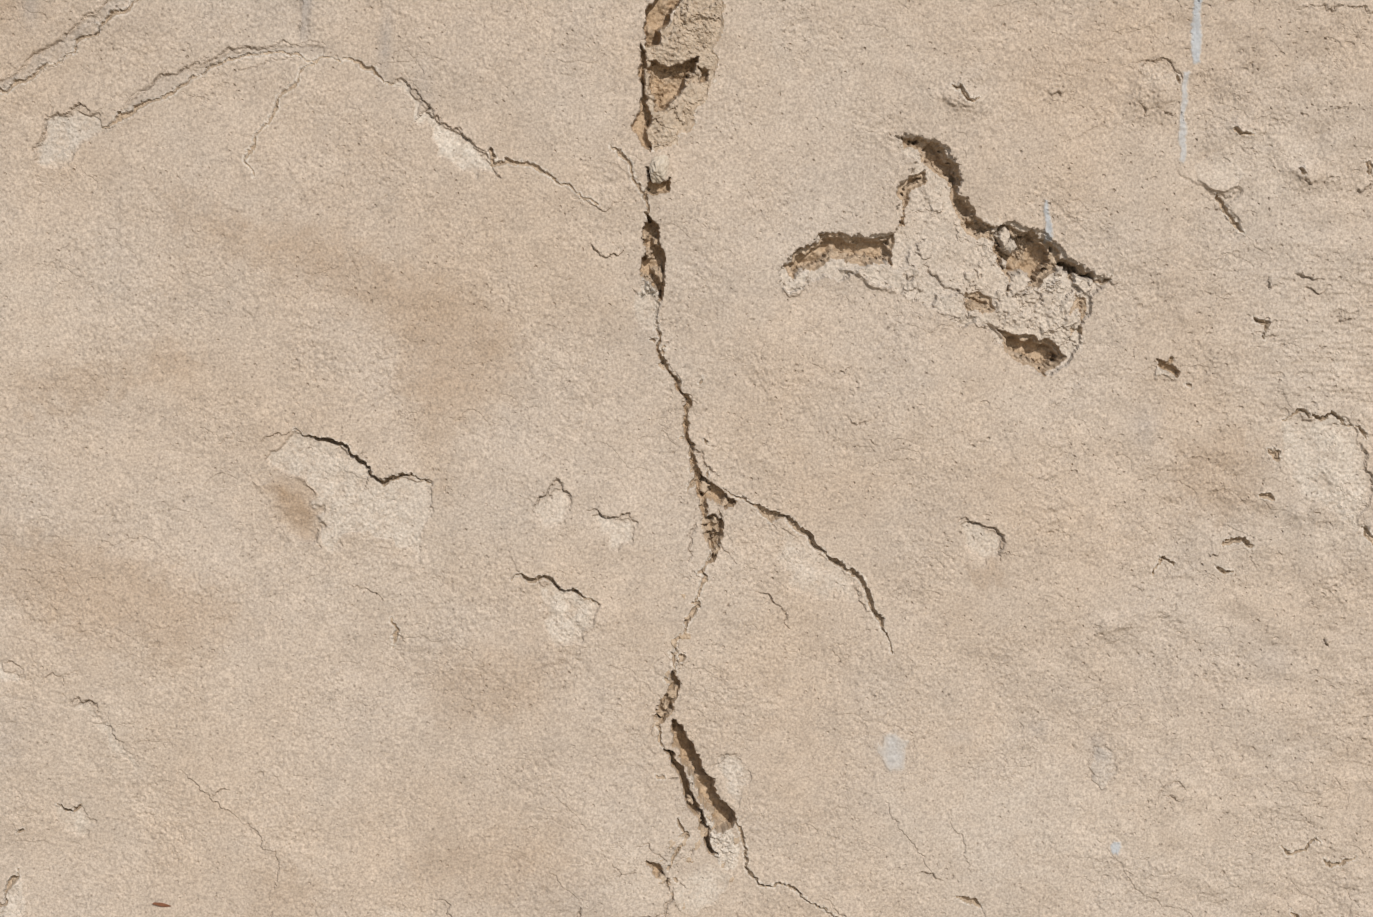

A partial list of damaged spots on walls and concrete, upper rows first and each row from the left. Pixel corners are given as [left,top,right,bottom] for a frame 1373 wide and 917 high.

crack [0,0,139,96]
peeling [33,103,130,173]
crack [102,0,394,176]
spalling [778,133,1118,378]
peeling [250,429,435,560]
crack [488,0,893,917]
peeling [0,868,29,917]
crack [885,801,986,917]
crack [1280,838,1360,908]